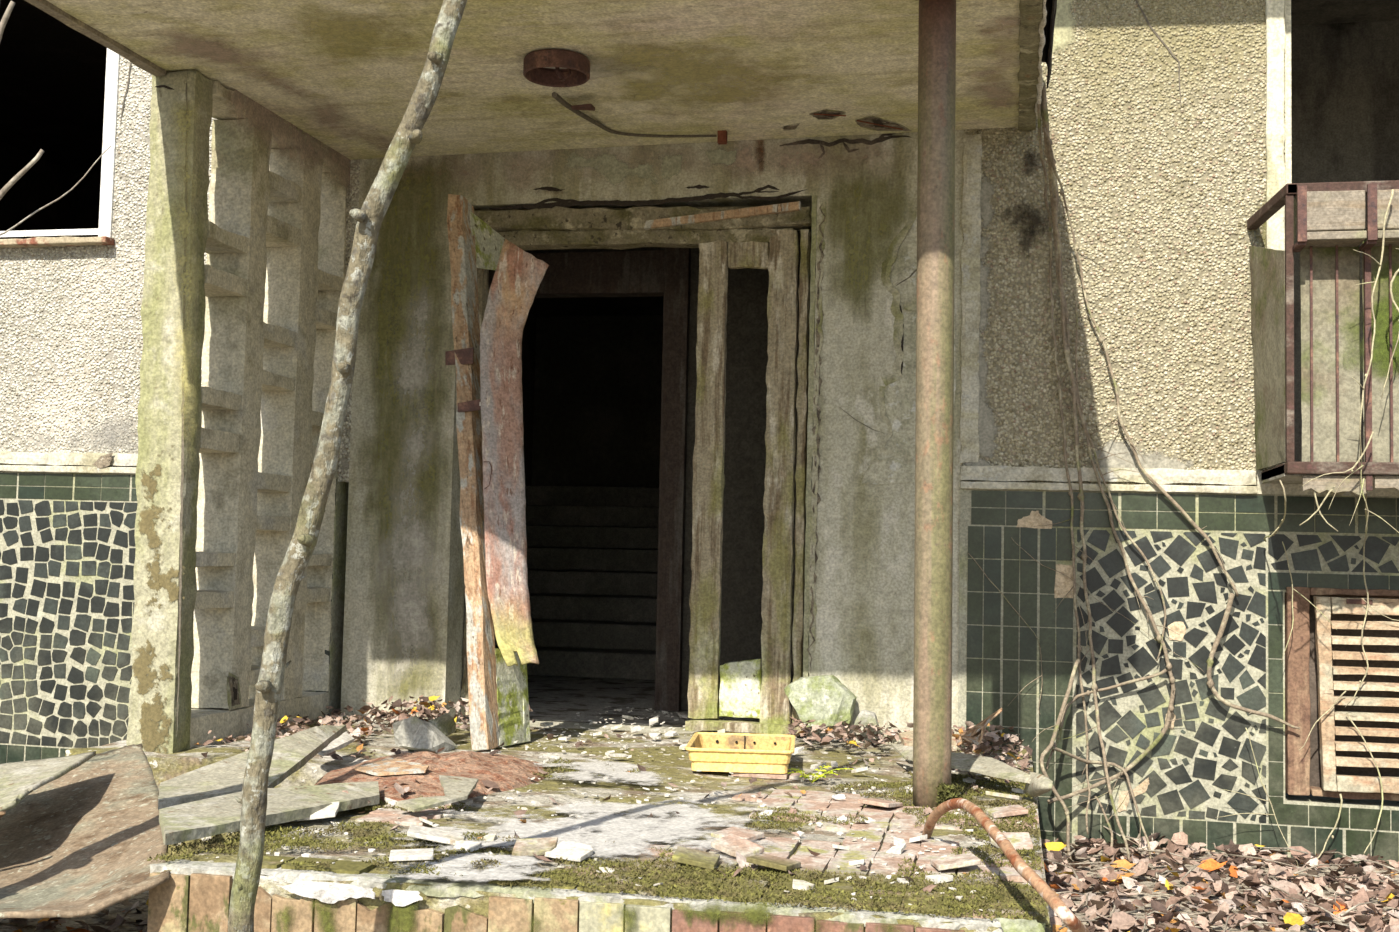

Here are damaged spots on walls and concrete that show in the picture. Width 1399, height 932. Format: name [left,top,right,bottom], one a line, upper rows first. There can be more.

crack [780,133,912,158]
crack [489,185,807,210]